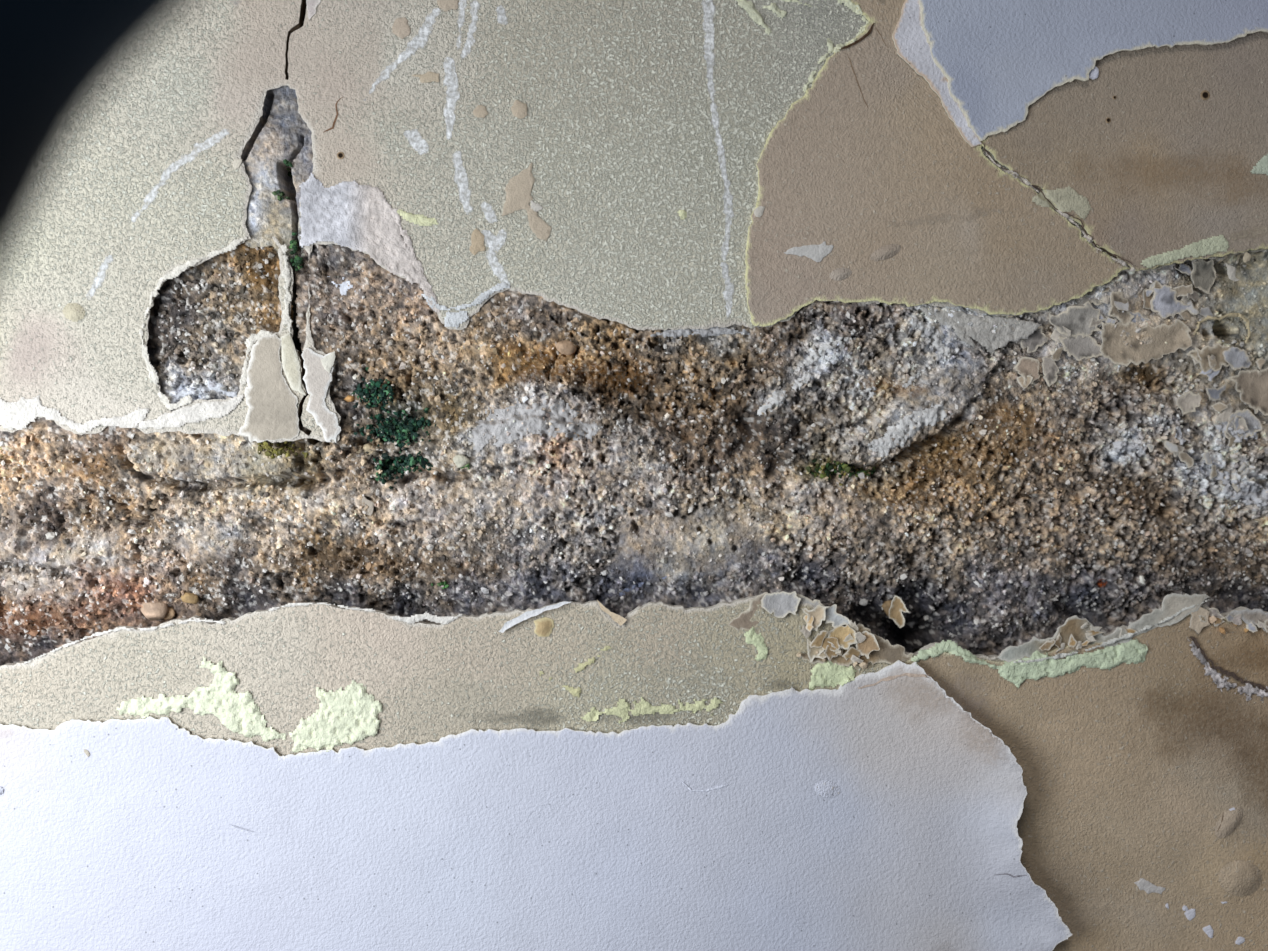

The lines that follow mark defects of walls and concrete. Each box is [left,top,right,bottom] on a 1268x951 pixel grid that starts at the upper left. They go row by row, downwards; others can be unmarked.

crack [285,0,307,80]
spalling [139,86,313,410]
crack [323,97,343,133]
flaking render [299,173,436,305]
peeling [745,0,1268,327]
crack [981,141,1138,271]
crack [298,350,311,436]
spalling [0,244,1268,951]
crack [1187,636,1268,702]